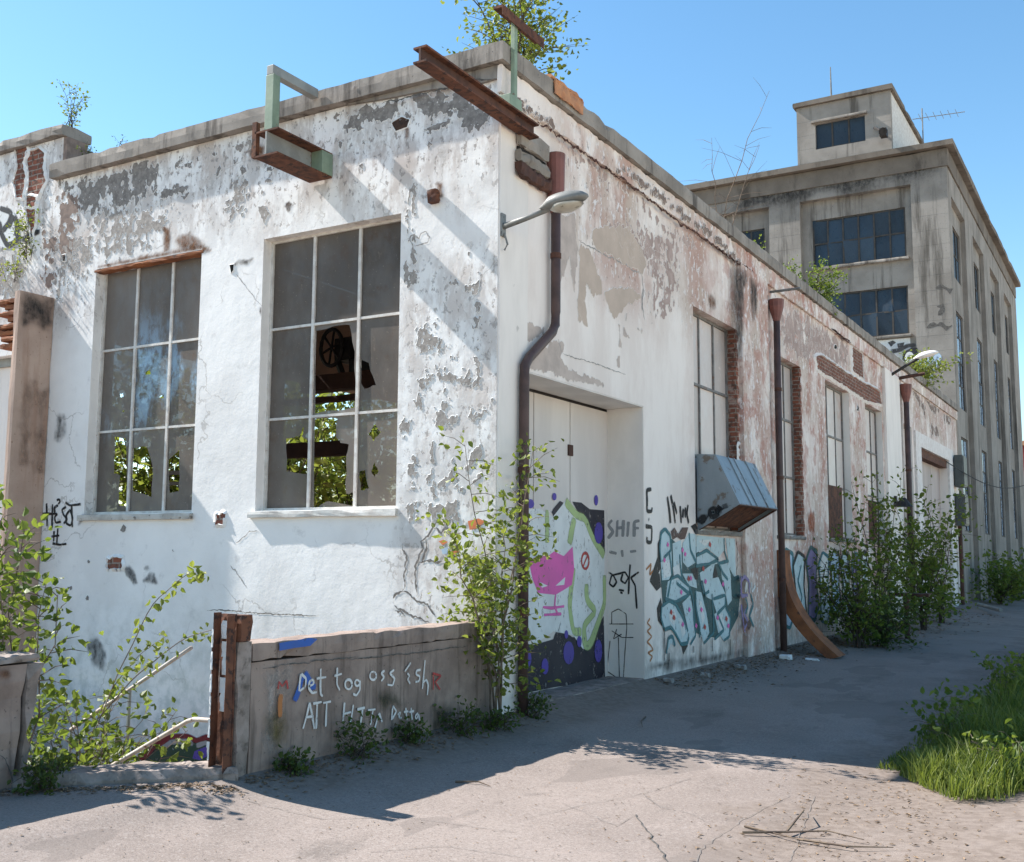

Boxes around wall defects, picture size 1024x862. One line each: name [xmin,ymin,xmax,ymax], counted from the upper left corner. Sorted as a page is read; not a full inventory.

flaking render [333,90,493,149]
flaking render [12,145,190,304]
flaking render [212,139,274,223]
flaking render [403,182,418,289]
spalling [515,97,741,368]
water stain [24,297,51,327]
flaking render [399,271,495,527]
flaking render [527,321,604,388]
flaking render [780,307,883,412]
flaking render [912,390,951,438]
crack [207,608,318,616]
crack [393,518,448,622]